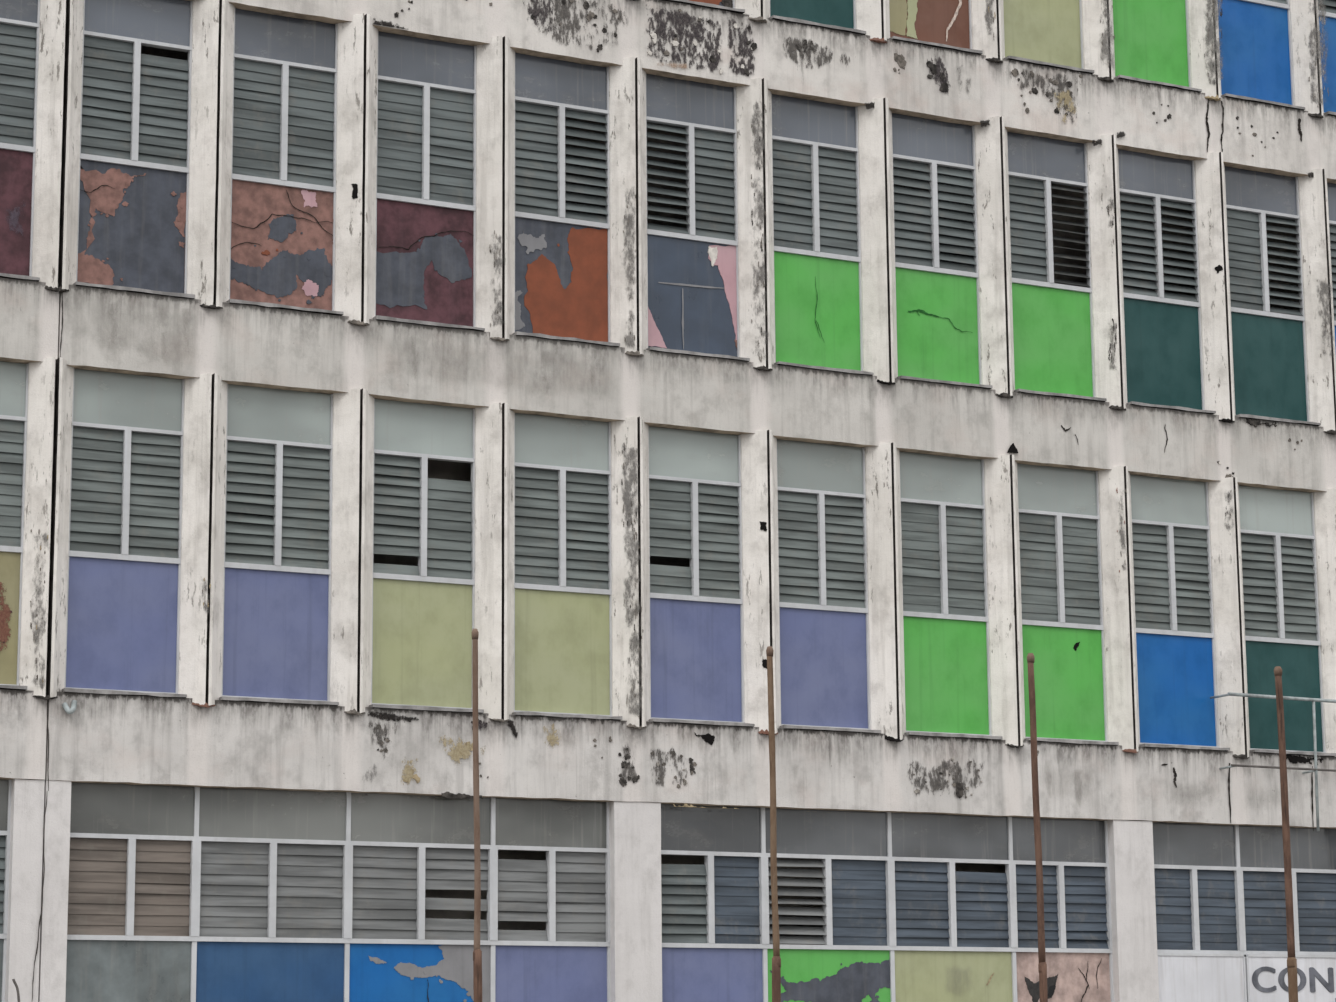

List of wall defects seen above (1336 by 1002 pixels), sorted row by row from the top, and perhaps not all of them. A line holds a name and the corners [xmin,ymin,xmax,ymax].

mould [523,0,627,52]
leakage [646,5,757,76]
mould [783,37,850,69]
mould [926,57,970,93]
peeling [985,0,1115,123]
peeling [45,165,146,292]
peeling [171,186,187,248]
peeling [230,190,333,304]
crack [815,278,824,341]
crack [908,309,973,333]
peeling [369,945,490,1002]
peeling [770,957,890,1002]